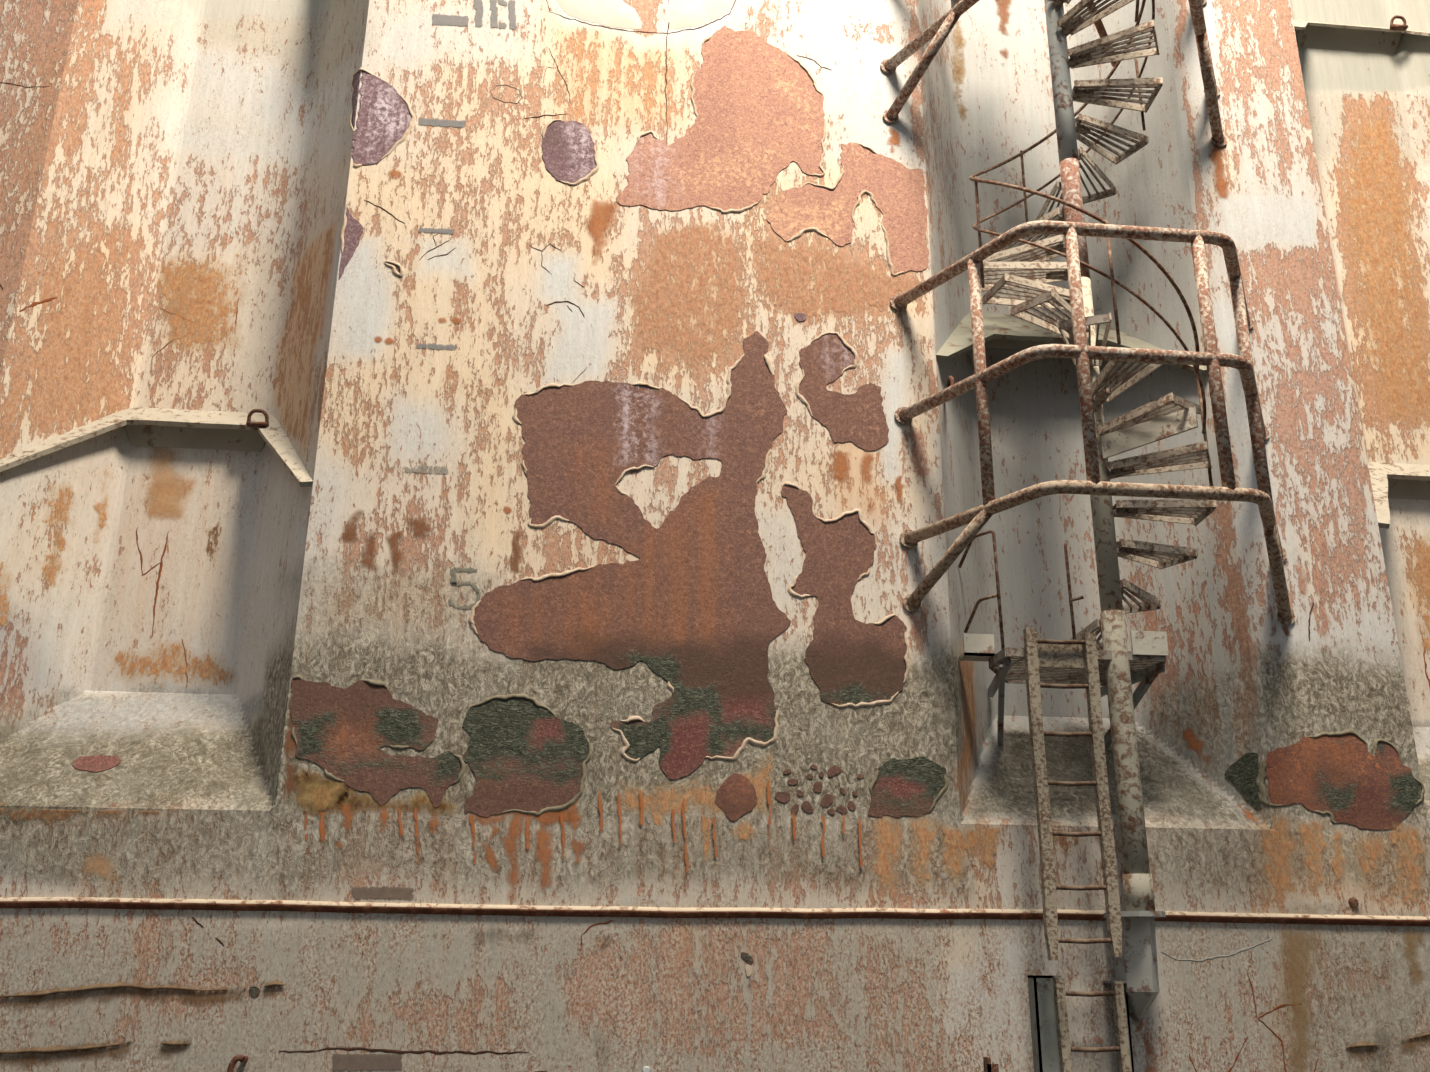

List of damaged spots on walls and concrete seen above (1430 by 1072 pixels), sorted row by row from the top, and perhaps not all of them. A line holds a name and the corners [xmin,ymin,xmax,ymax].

peeling [349,67,416,168]
peeling [541,119,600,186]
peeling [617,26,929,276]
corrosion [1342,115,1430,428]
peeling [468,331,911,821]
corrosion [1408,540,1430,654]
corrosion [284,715,584,897]
peeling [290,675,592,817]
corrosion [598,756,775,879]
peeling [775,756,949,818]
corrosion [821,814,1000,893]
peeling [1224,728,1425,830]